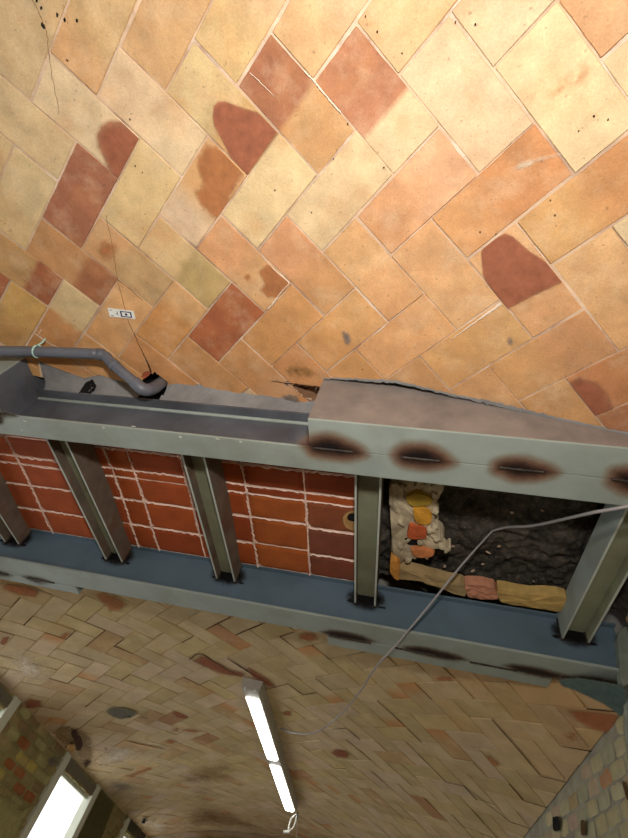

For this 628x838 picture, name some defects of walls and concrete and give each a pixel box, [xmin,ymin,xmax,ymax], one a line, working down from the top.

crack [106,218,152,373]
spalling [273,381,320,402]
spalling [389,479,566,612]